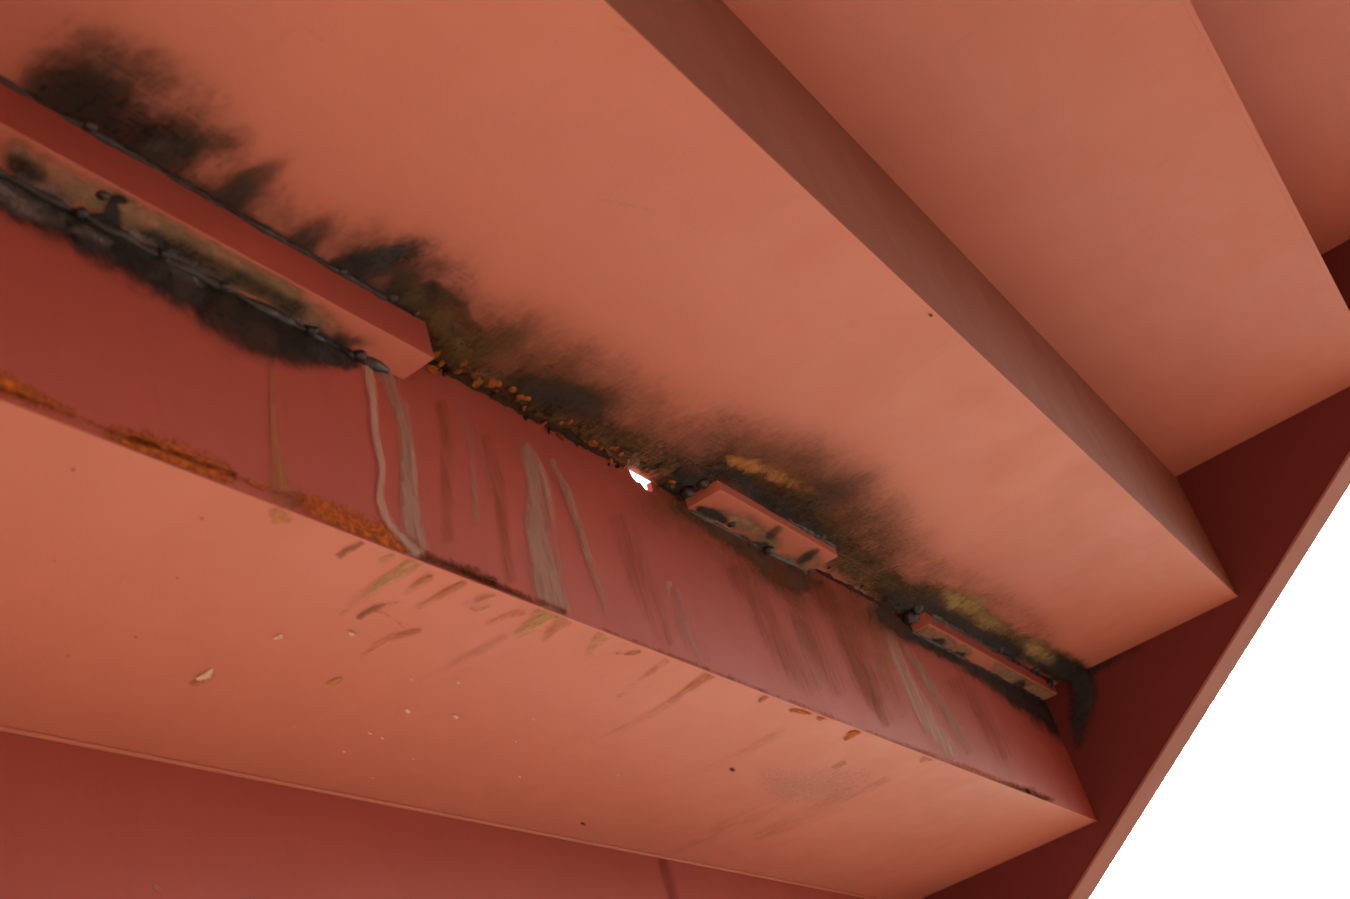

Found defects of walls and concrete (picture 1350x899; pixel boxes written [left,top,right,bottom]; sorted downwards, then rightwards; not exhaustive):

damp [8,143,358,353]
corrosion [0,372,566,637]
damp [365,367,427,595]
damp [522,444,592,631]
damp [697,506,820,571]
corrosion [756,688,1055,803]
damp [869,619,970,758]
damp [993,665,1056,701]